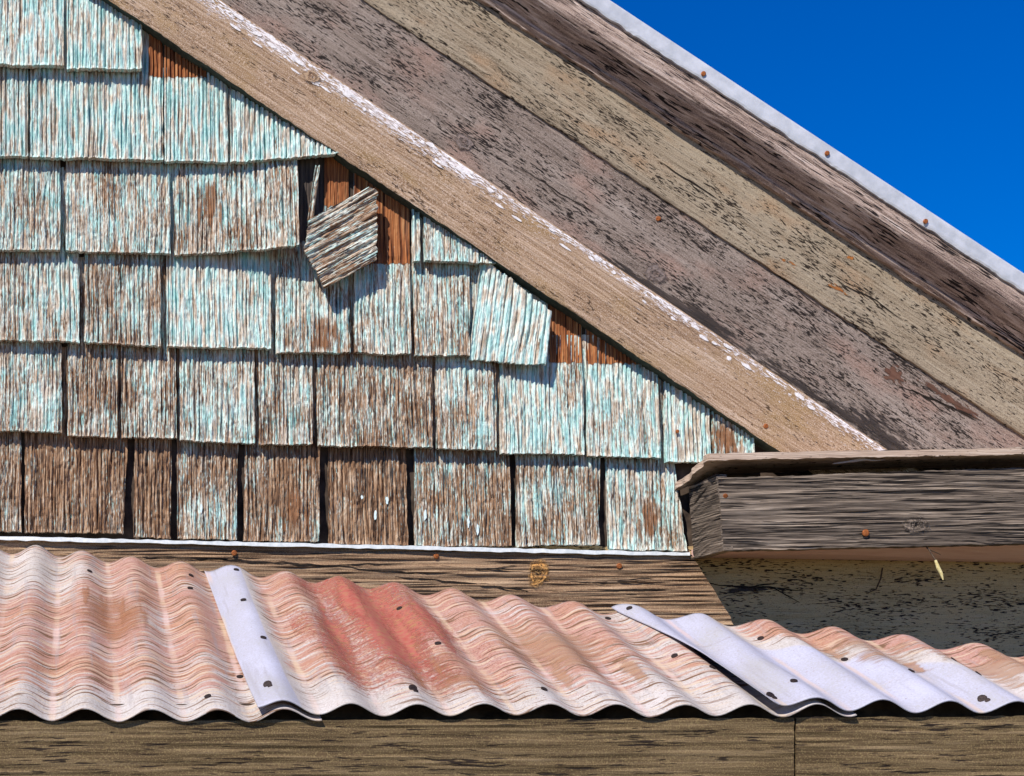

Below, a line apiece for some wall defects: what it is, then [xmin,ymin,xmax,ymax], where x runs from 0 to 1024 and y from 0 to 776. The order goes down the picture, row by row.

peeling [149,34,207,78]
peeling [190,0,884,451]